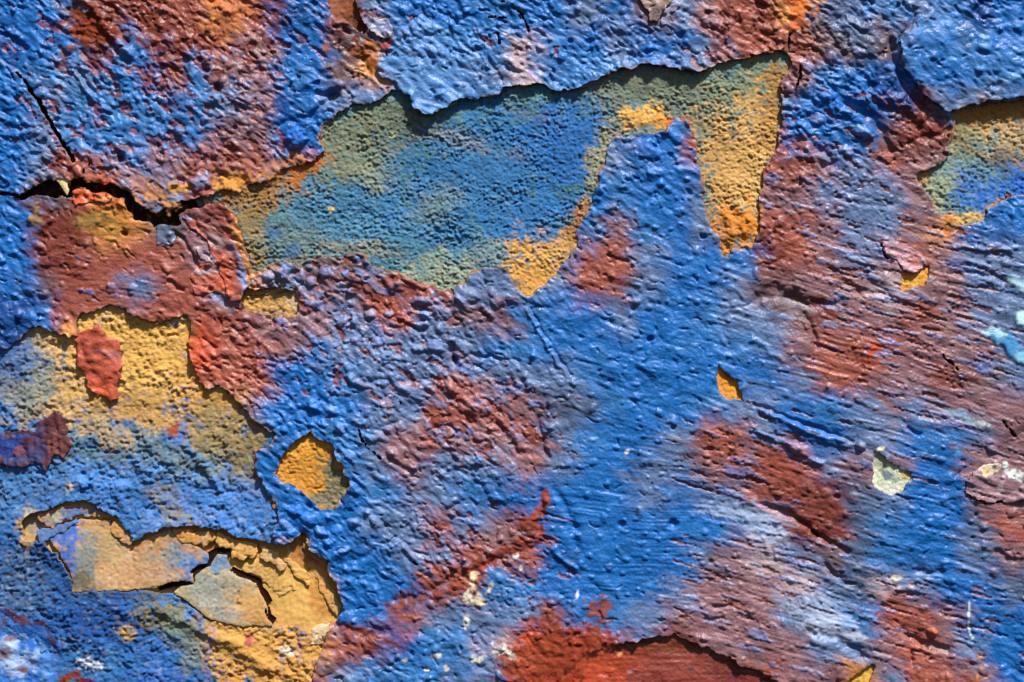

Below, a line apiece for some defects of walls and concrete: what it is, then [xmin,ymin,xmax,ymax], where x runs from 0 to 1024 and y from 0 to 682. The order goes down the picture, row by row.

crack [0,74,199,245]
flaking render [182,0,802,320]
flaking render [899,13,1024,235]
peeling [0,305,350,682]
peeling [716,365,743,401]
peeling [872,451,913,495]